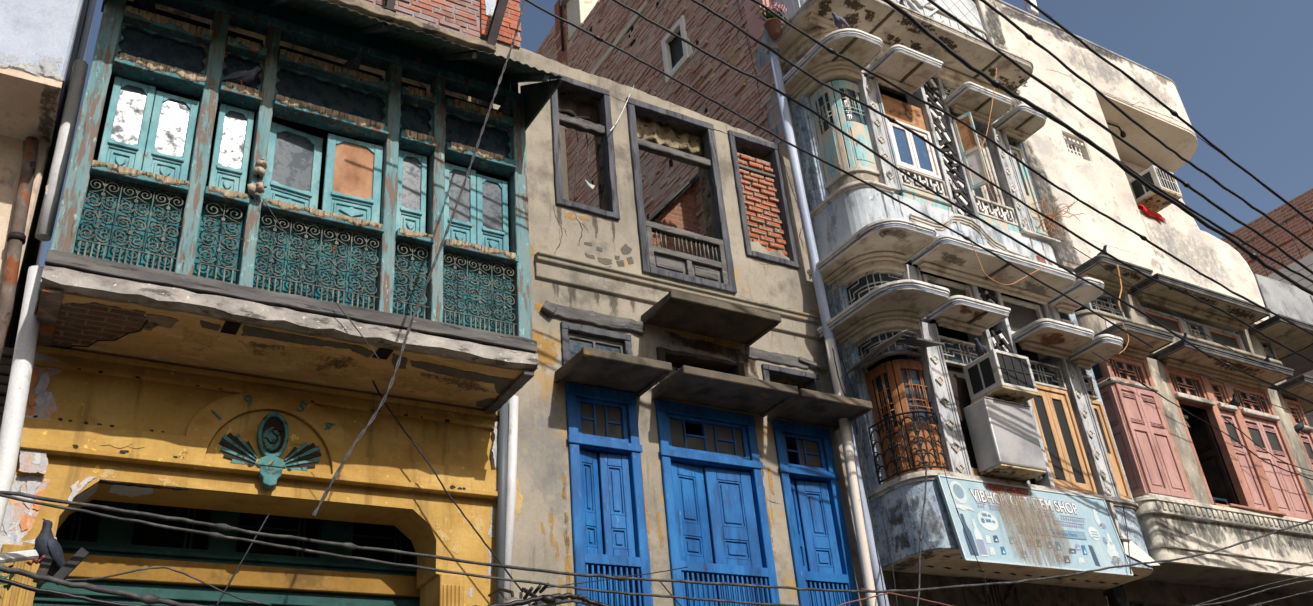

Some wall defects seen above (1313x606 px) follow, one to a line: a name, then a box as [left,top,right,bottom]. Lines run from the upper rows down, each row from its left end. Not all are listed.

water stain [985,2,1117,60]
water stain [1015,141,1078,272]
spalling [25,302,179,427]
peeling [0,449,50,553]
water stain [888,497,943,570]
water stain [1153,503,1313,558]